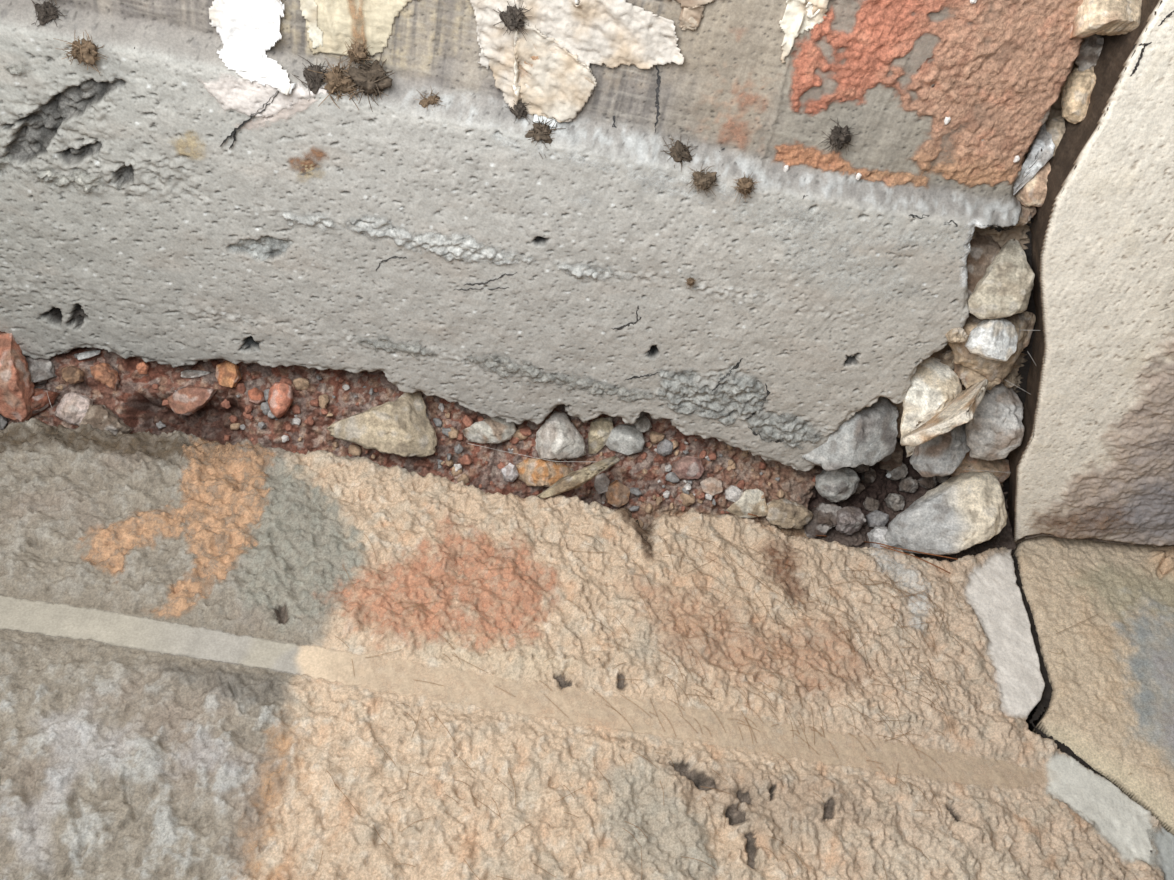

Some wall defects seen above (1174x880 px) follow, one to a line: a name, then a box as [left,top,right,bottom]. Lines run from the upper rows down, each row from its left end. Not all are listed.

peeling [300,0,419,57]
peeling [209,0,316,129]
peeling [470,0,714,127]
peeling [774,142,929,187]
spalling [181,370,212,378]
peeling [668,404,822,450]
spalling [725,488,767,518]
crack [1013,554,1130,798]